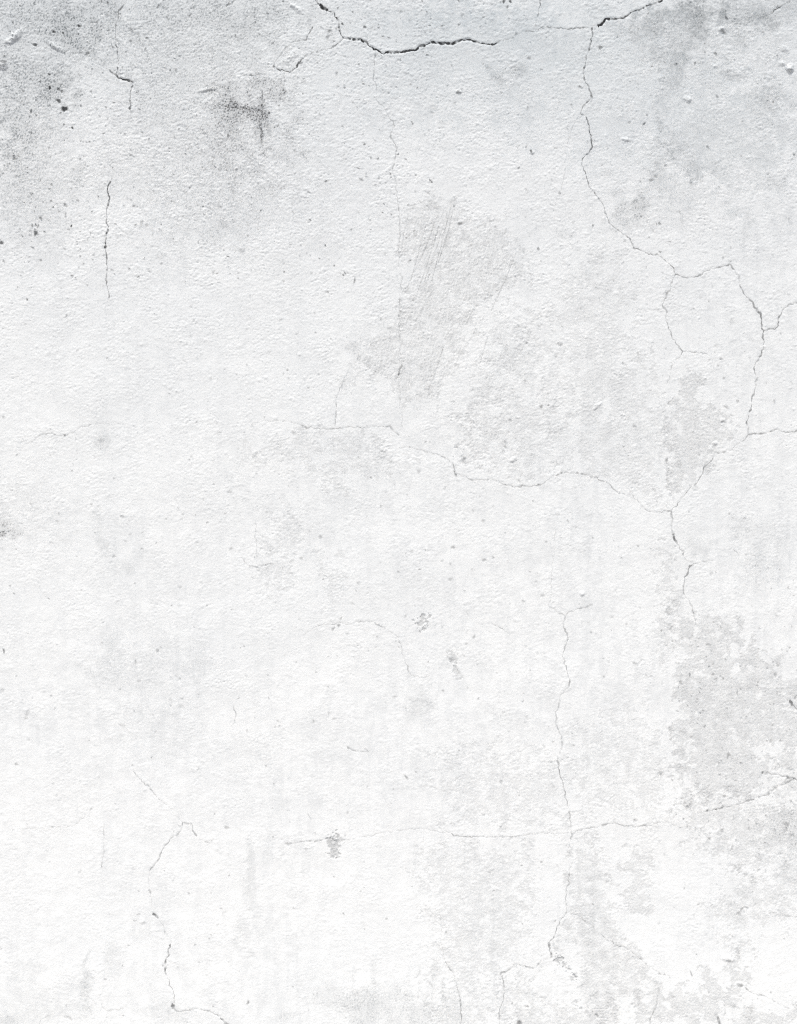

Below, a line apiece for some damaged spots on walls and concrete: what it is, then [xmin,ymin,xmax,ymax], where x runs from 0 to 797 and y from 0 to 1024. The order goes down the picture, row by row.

crack [319,4,497,54]
crack [592,0,663,29]